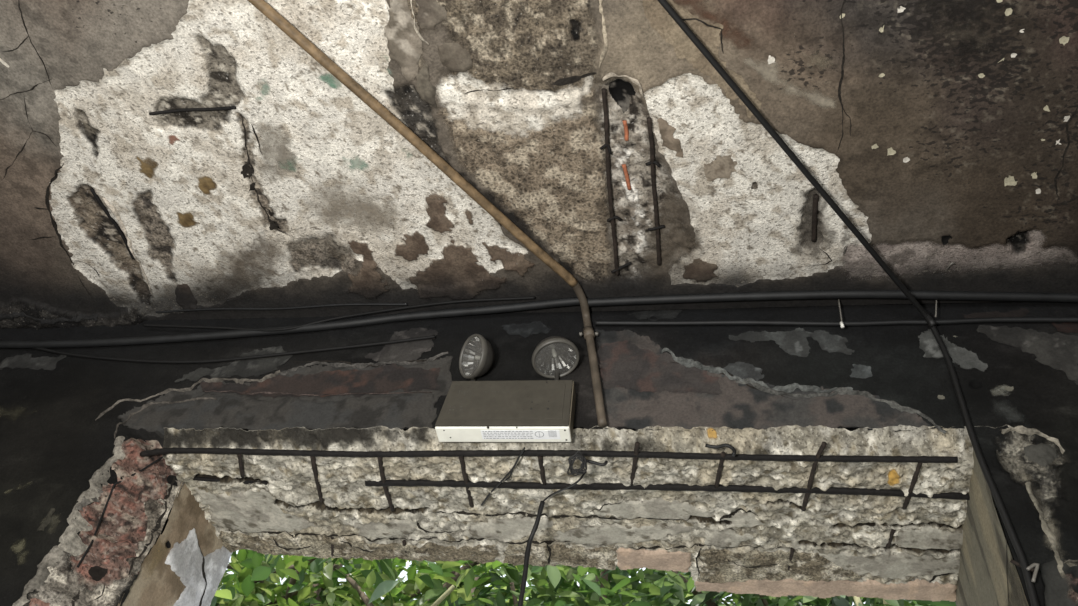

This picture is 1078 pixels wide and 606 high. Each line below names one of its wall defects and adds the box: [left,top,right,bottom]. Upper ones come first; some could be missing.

crack [837,0,851,152]
crack [0,0,99,302]
flaking render [49,0,1078,318]
crack [1046,105,1078,222]
flaking render [594,327,947,434]
peeling [977,325,1078,385]
flaking render [12,328,617,606]
crack [72,474,963,606]
spalling [697,548,863,584]
water stain [1009,564,1027,606]